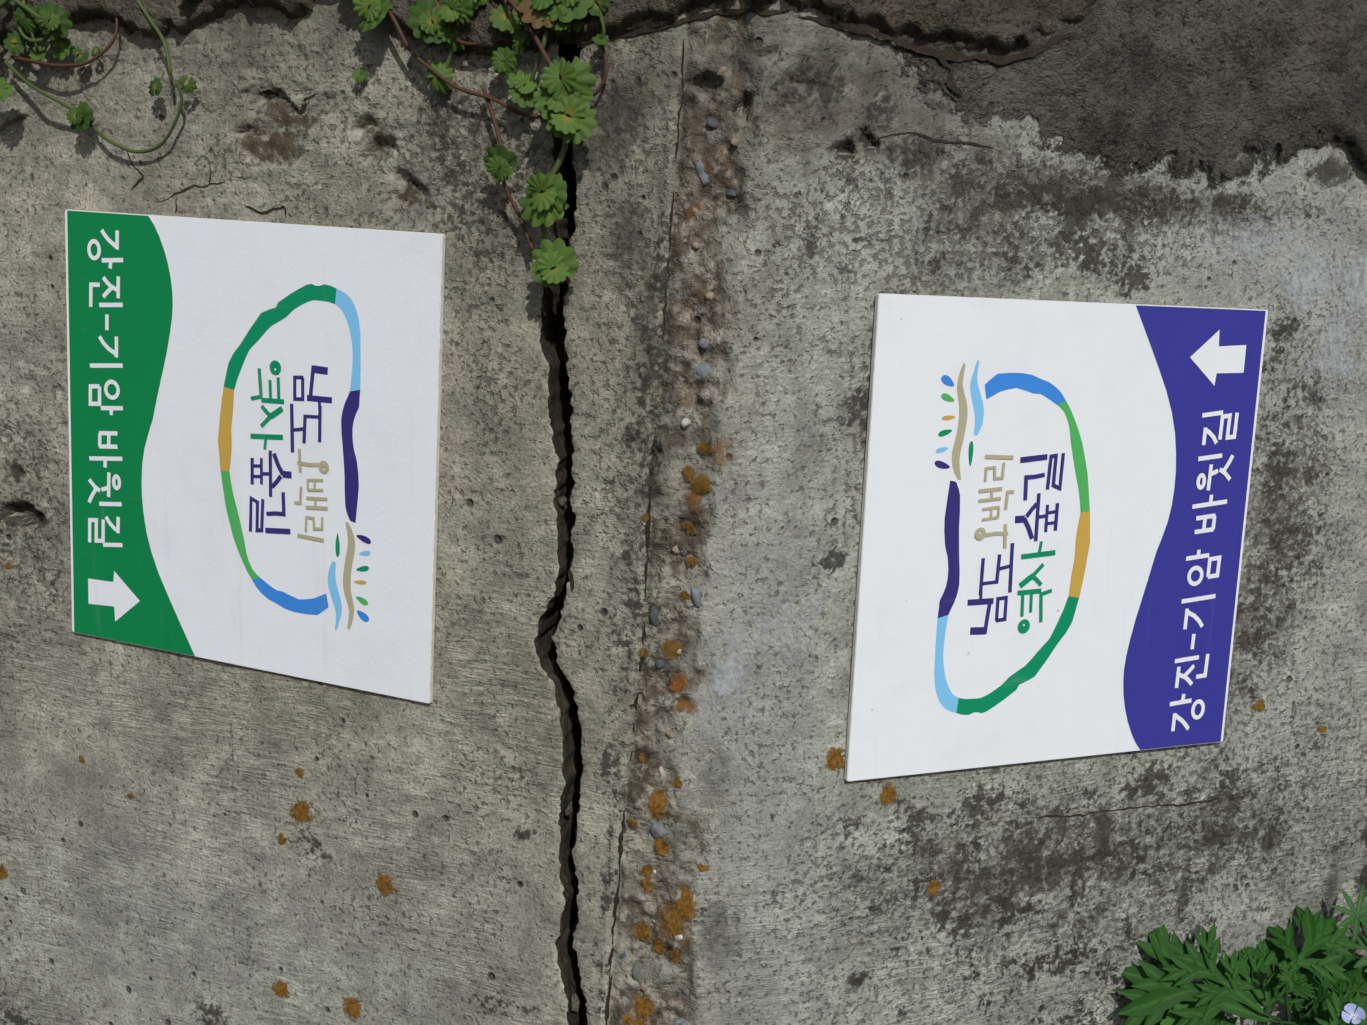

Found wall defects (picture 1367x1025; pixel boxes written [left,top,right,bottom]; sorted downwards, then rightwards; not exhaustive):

crack [558,7,1078,95]
crack [878,132,994,148]
crack [534,132,588,1025]